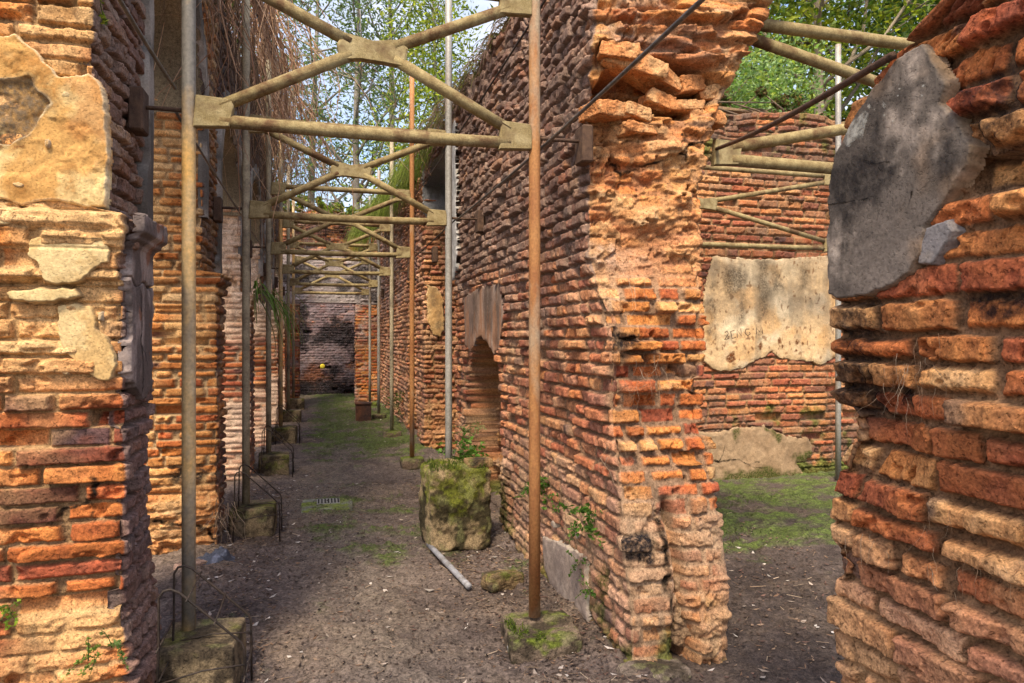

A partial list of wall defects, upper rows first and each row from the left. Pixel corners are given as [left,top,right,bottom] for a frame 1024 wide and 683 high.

peeling [196,0,209,96]
spalling [579,40,727,138]
peeling [0,0,168,400]
peeling [702,44,990,372]
peeling [698,424,813,480]